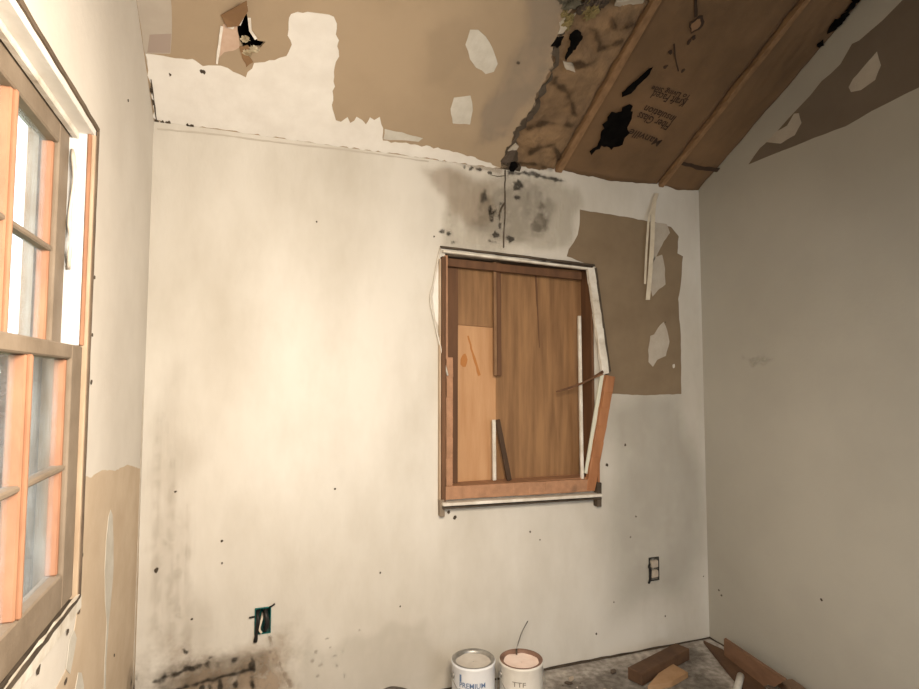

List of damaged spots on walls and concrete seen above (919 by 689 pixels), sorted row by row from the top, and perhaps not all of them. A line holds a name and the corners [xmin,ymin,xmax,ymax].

spalling [216,1,259,67]
peeling [551,13,576,48]
peeling [749,0,919,164]
peeling [501,143,519,172]
damp [508,171,562,199]
damp [481,192,514,242]
peeling [567,210,683,395]
peeling [56,465,140,689]
damp [154,653,282,689]